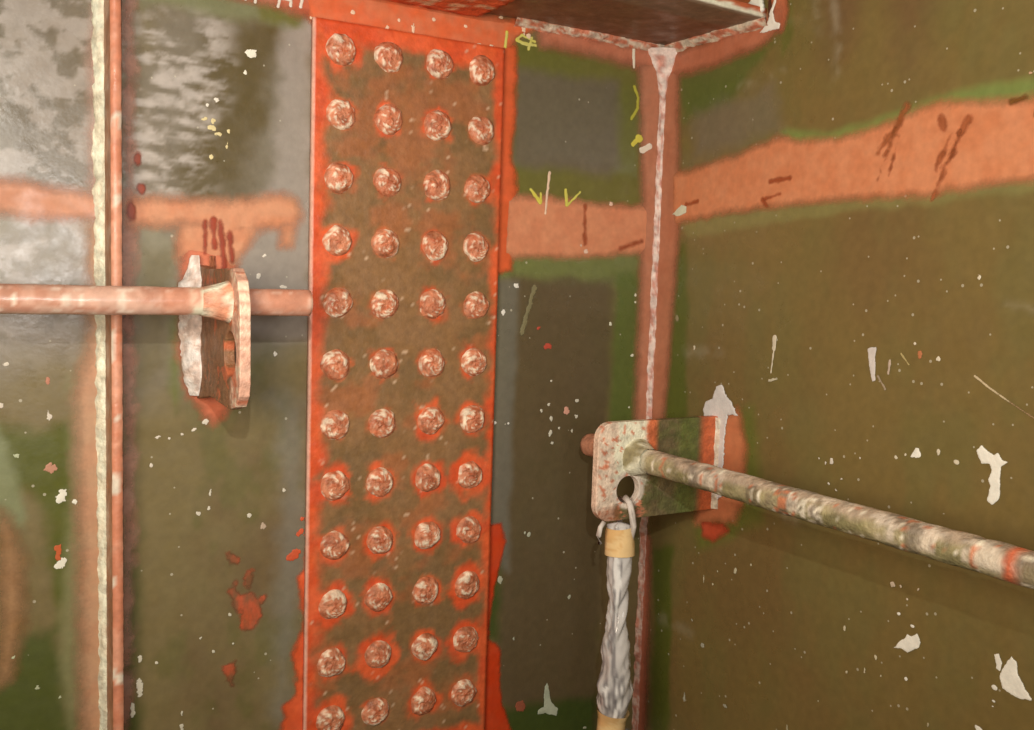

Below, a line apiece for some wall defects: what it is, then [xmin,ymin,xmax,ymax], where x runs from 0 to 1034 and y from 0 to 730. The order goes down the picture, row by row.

rust [877,103,910,171]
rust [938,115,971,136]
rust [931,148,955,200]
rust [203,217,234,269]
peeling [977,445,1007,505]
rust [226,552,266,630]
peeling [894,625,920,652]
peeling [538,684,558,716]
peeling [992,654,1032,707]